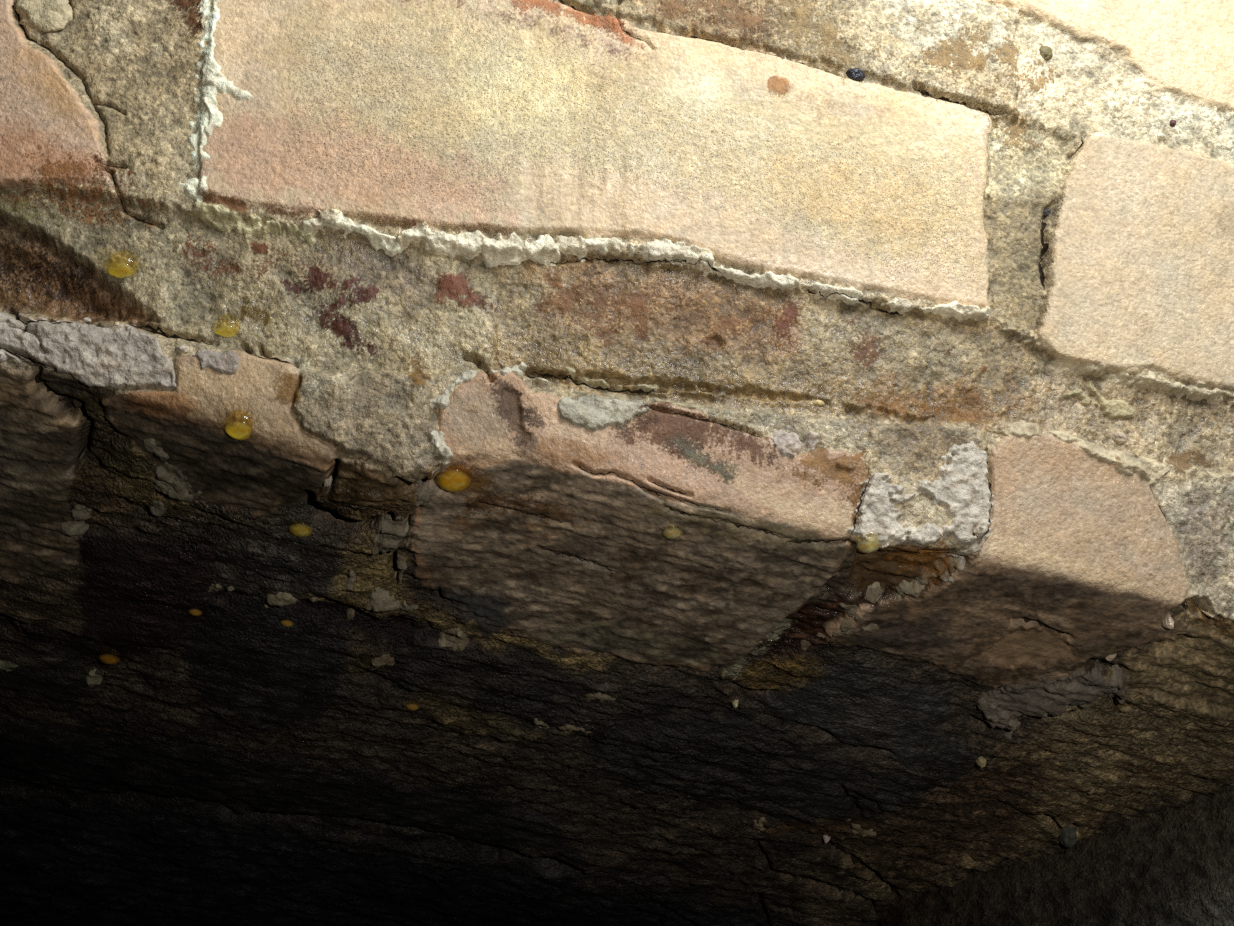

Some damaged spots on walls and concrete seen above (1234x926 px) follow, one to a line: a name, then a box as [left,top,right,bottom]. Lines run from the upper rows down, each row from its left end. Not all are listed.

corrosion [167,0,208,46]
corrosion [477,0,644,58]
damp [178,0,865,305]
damp [240,297,271,326]
damp [881,297,990,322]
damp [430,362,549,409]
damp [772,429,818,458]
damp [142,438,202,517]
damp [60,504,92,537]
damp [346,430,564,621]
damp [800,440,995,651]
damp [264,591,319,608]